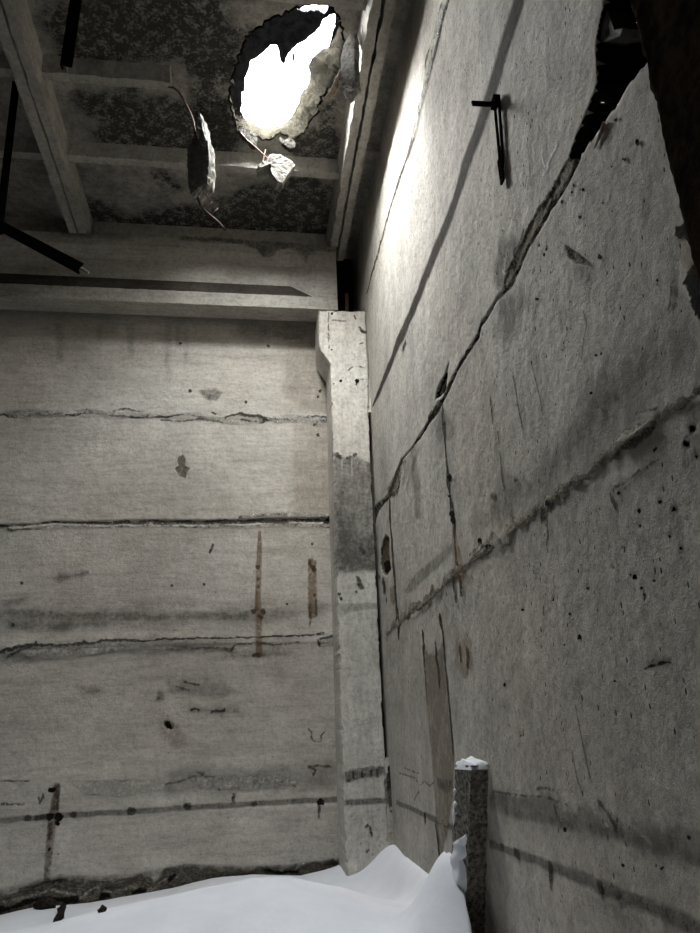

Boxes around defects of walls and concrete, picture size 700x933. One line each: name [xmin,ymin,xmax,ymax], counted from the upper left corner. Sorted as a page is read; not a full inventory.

leakage [74,0,253,152]
spalling [228,4,344,139]
leakage [292,100,340,159]
leakage [87,177,335,259]
crack [0,408,327,426]
crack [375,159,700,640]
crack [0,511,330,532]
corrosion [251,531,265,658]
corrosion [308,559,317,624]
spalling [379,535,391,603]
crack [0,632,324,658]
corrosion [40,784,64,882]